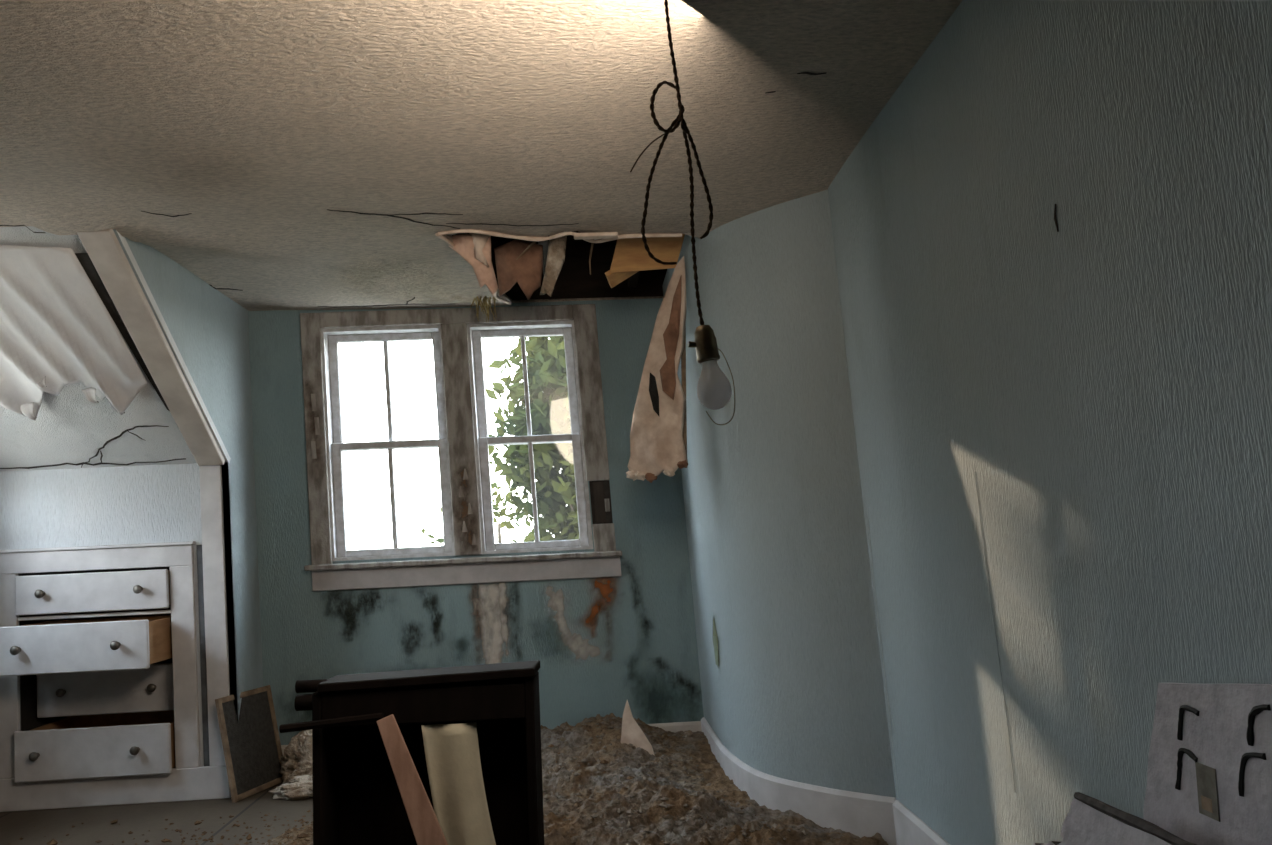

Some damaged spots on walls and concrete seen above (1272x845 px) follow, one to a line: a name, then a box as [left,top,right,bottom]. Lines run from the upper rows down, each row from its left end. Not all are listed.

damp [329,592,380,636]
damp [402,591,442,653]
damp [458,582,519,664]
damp [547,587,599,658]
damp [632,660,696,724]